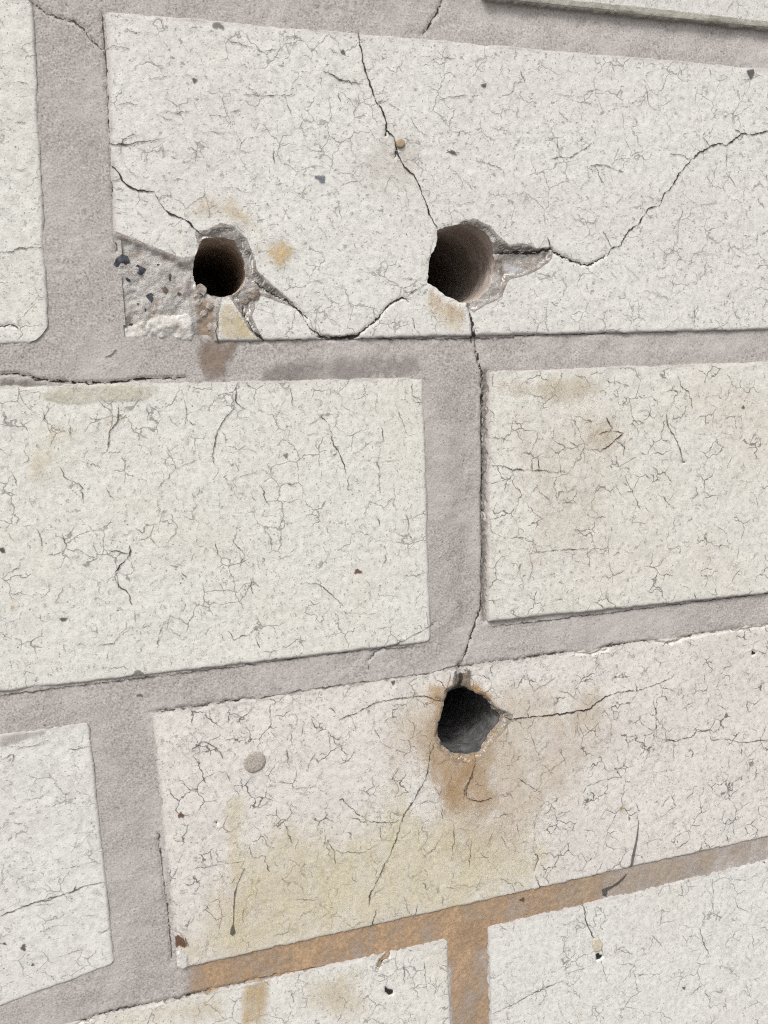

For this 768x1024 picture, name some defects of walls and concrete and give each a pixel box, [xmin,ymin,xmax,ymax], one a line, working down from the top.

crack [110,33,768,322]
spalling [114,223,293,341]
crack [215,306,264,344]
crack [248,258,431,340]
spalling [459,219,553,312]
crack [0,350,434,669]
crack [166,313,768,927]
rust [428,689,490,808]
spalling [434,669,513,763]
crack [1,830,101,935]
rust [191,872,608,1024]
crack [492,879,765,1024]